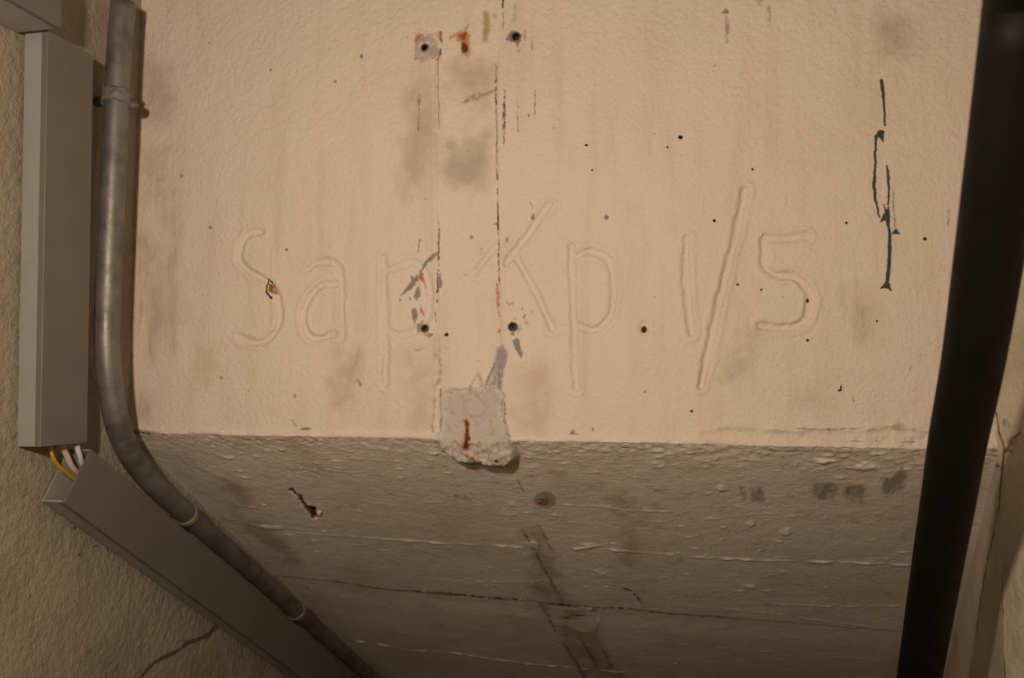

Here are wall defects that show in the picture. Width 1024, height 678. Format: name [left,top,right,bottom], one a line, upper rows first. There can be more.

corrosion [449,12,497,56]
spalling [430,308,527,468]
spalling [289,488,322,519]
crack [976,412,1021,630]
crack [139,625,218,678]
crack [335,525,745,677]